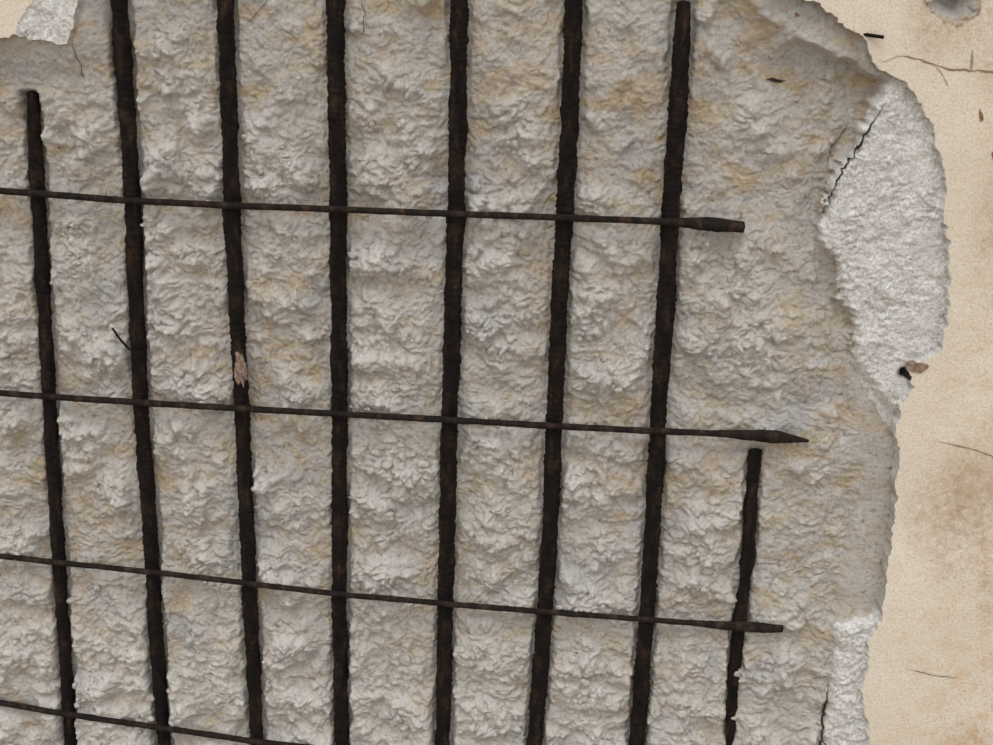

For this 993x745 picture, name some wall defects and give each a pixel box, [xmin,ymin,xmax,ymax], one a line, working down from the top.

spalling [0,0,158,745]
spalling [128,0,251,745]
rust [234,352,248,388]
spalling [234,0,336,745]
spalling [343,0,451,745]
spalling [449,0,565,745]
spalling [542,0,951,745]
crack [819,684,828,745]
crack [827,101,887,204]
crack [882,56,993,86]
spalling [924,0,983,27]